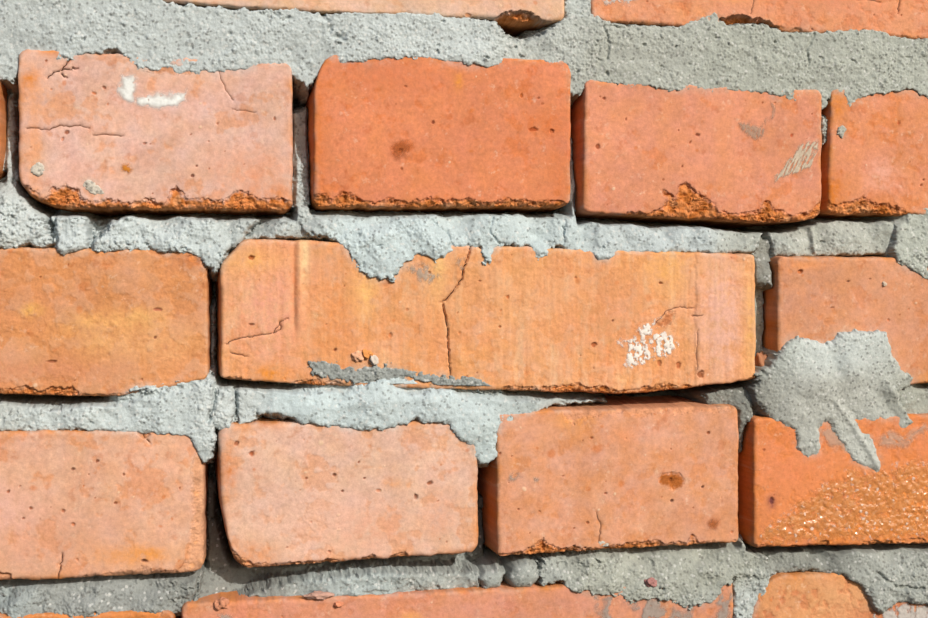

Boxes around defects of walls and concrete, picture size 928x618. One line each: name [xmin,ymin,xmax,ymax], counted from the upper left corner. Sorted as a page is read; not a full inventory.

spalling [492,10,546,31]
crack [27,125,122,137]
spalling [22,182,293,215]
spalling [310,191,568,212]
spalling [604,182,908,225]
crack [441,246,471,375]
leakage [618,319,679,368]
crack [655,307,703,367]